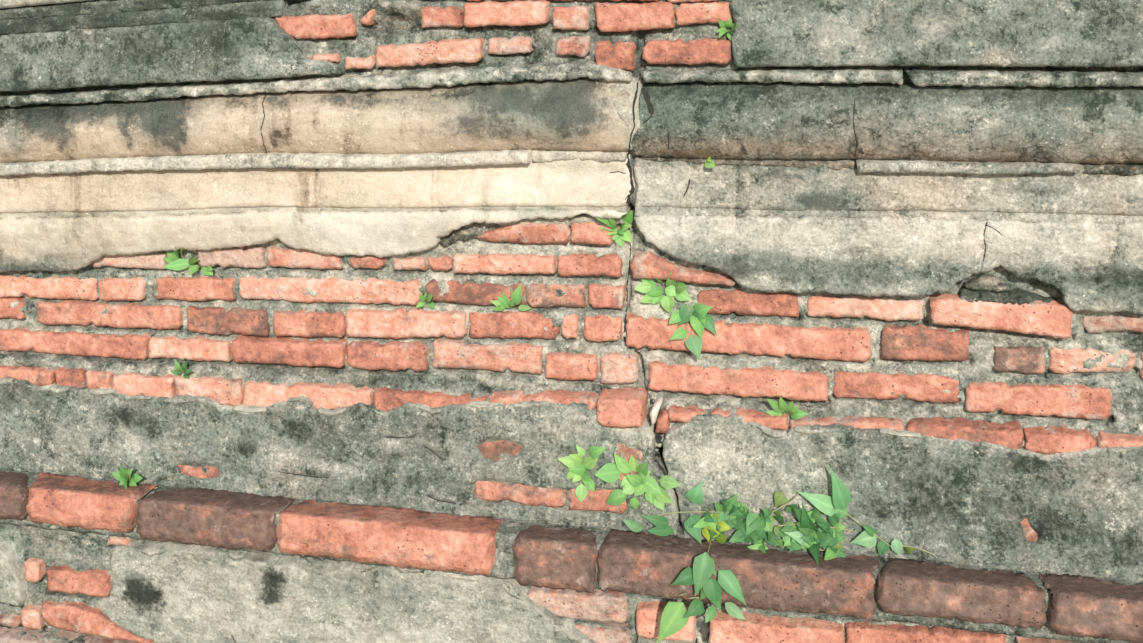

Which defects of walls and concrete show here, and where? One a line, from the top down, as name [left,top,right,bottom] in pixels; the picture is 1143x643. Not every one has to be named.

spalling [274,0,747,84]
leakage [0,100,188,152]
crack [260,93,268,153]
crack [610,73,669,204]
crack [983,222,1002,261]
spalling [0,205,1143,461]
crack [623,243,676,492]
spalling [474,443,643,514]
spalling [1021,518,1038,542]
spalling [0,524,201,643]
peeling [445,573,479,582]
spalling [499,579,1075,643]